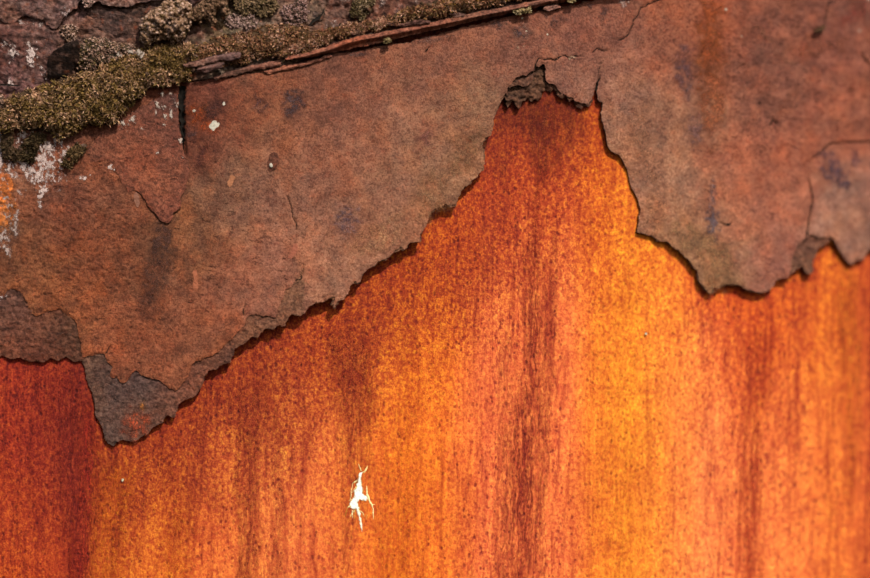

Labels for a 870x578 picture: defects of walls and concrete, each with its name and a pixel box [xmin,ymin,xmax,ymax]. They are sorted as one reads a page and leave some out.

leakage [4,41,46,72]
leakage [0,132,70,256]
crack [178,85,189,153]
corrosion [0,0,870,446]
crack [803,141,870,241]
corrosion [514,228,550,578]
corrosion [237,396,260,578]
corrosion [744,419,761,578]